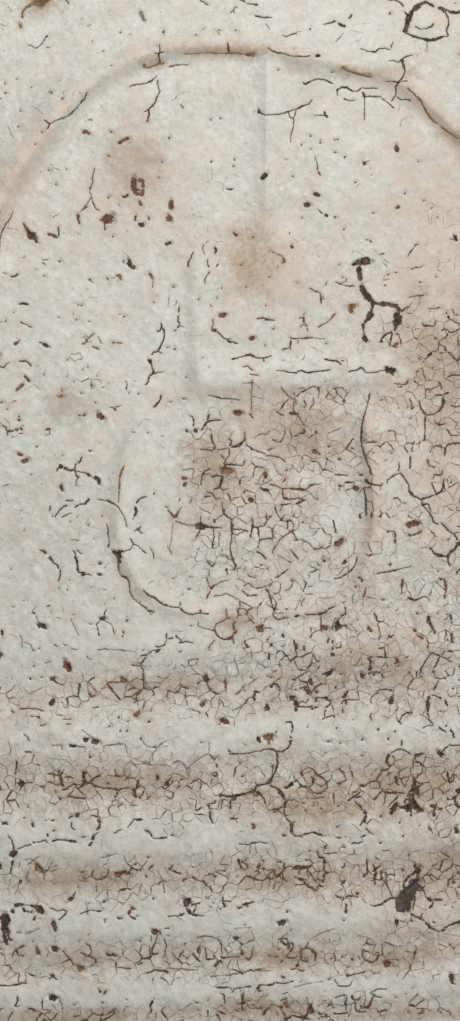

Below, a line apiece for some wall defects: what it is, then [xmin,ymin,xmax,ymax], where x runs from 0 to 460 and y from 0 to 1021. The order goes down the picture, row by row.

crack [130,0,460,142]
crack [33,91,102,129]
crack [53,168,99,224]
crack [0,241,460,1021]
spalling [394,864,423,927]